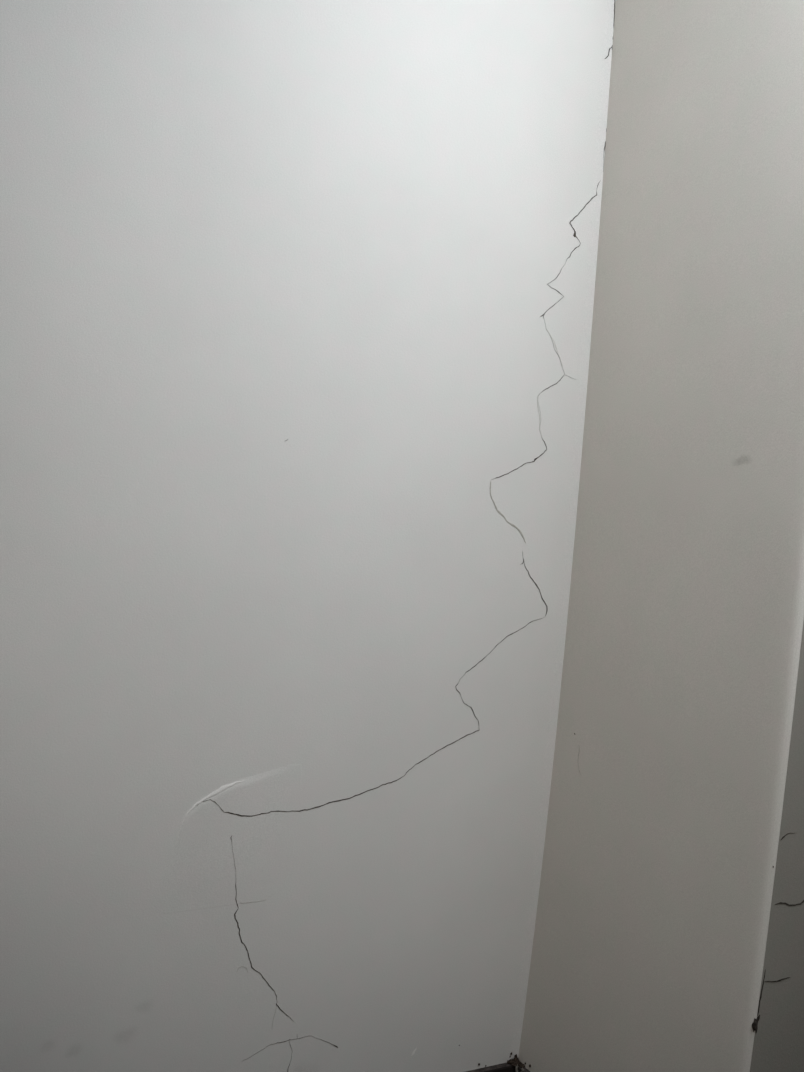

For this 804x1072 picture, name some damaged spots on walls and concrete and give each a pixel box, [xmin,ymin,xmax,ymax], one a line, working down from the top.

crack [203,128,607,1072]